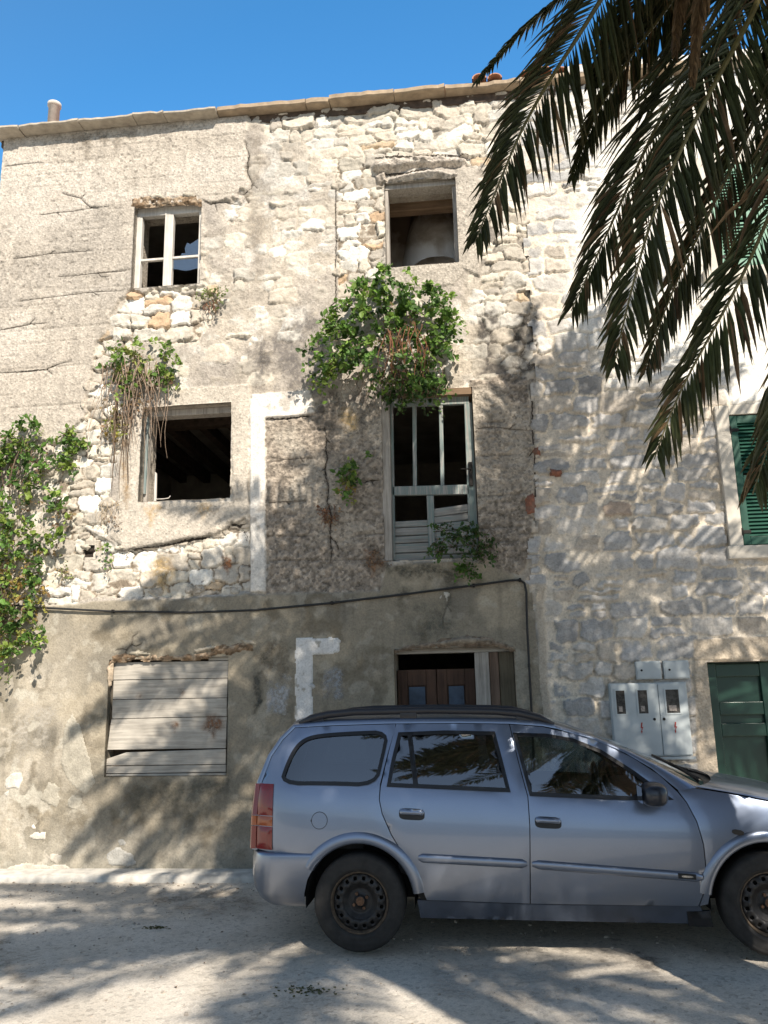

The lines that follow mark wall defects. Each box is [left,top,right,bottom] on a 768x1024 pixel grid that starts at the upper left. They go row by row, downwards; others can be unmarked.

crack [205,145,258,210]
spalling [42,286,251,605]
crack [476,401,536,497]
crack [266,416,339,561]
spalling [107,639,256,687]
peeling [4,773,23,796]
peeling [29,824,46,840]